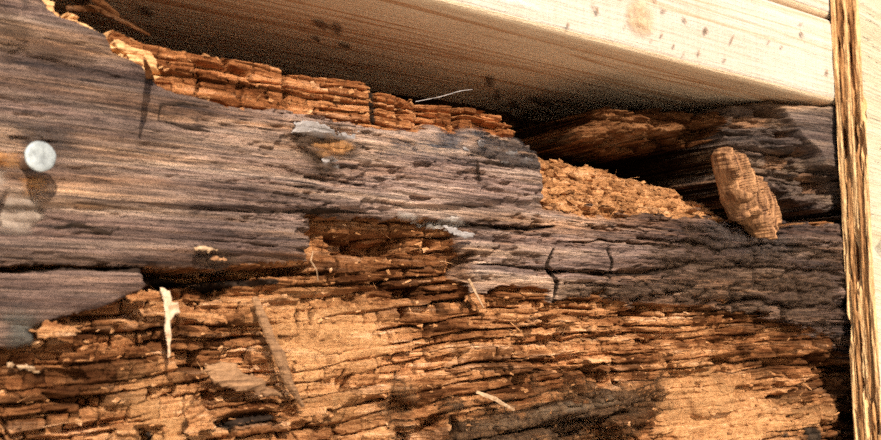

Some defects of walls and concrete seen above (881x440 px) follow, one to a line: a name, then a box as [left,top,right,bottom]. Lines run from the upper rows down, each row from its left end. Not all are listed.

spalling [313,22,350,50]
peeling [291,120,360,176]
spalling [369,77,737,225]
crack [424,223,555,231]
spalling [783,214,842,223]
crack [0,267,279,293]
peeling [193,246,236,275]
spalling [307,214,475,304]
crack [479,240,688,303]